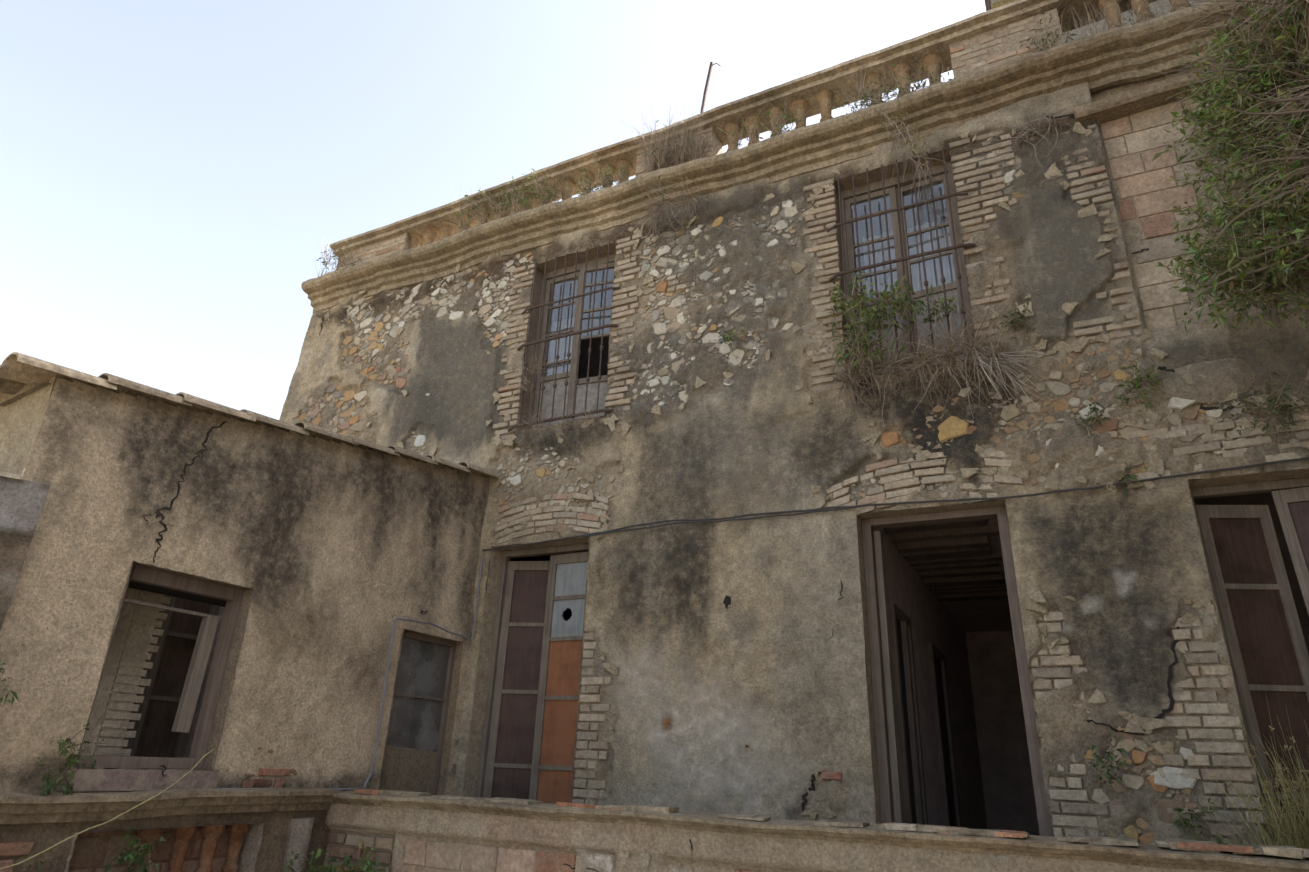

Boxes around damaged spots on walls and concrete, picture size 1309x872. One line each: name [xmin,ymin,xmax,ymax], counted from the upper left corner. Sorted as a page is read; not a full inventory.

crack [143,421,227,562]
leakage [129,413,467,582]
flaking render [292,252,623,545]
flaking render [582,169,847,436]
flaking render [810,121,1309,517]
flaking render [572,625,619,805]
flaking render [1022,584,1106,714]
leakage [1036,499,1170,717]
flaking render [1049,598,1265,845]